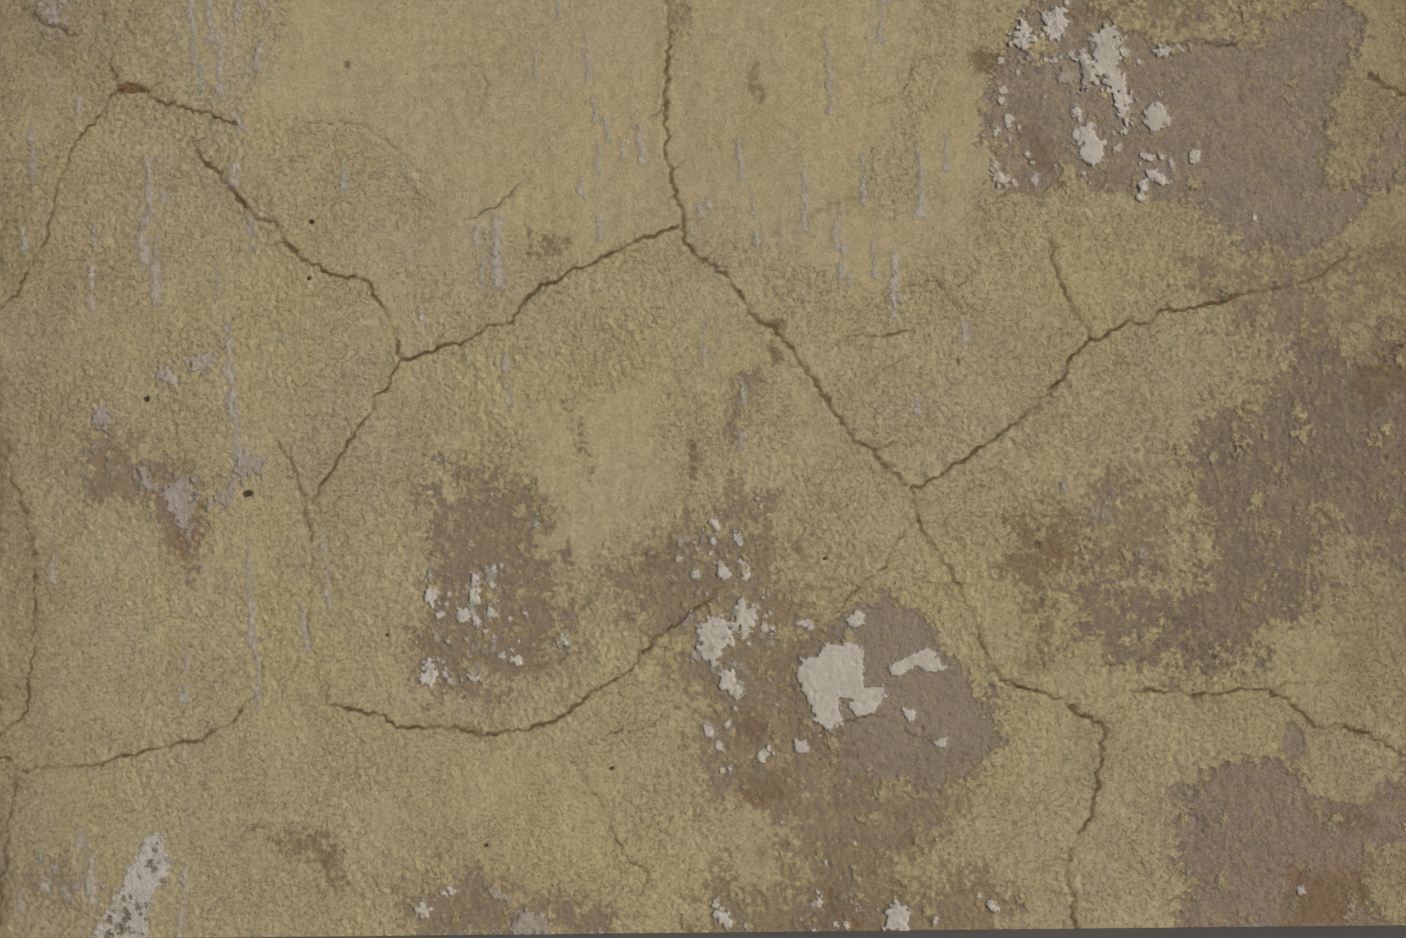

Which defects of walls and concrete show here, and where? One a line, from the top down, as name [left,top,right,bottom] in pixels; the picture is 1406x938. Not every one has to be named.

crack [0,58,236,310]
peeling [144,353,220,402]
crack [198,26,1026,588]
crack [1051,248,1279,389]
spalling [968,0,1406,714]
peeling [67,403,271,583]
crack [82,708,243,767]
crack [340,598,712,736]
spalling [386,453,1034,935]
crack [978,626,1107,929]
crack [1144,686,1406,756]
peeling [9,831,175,938]